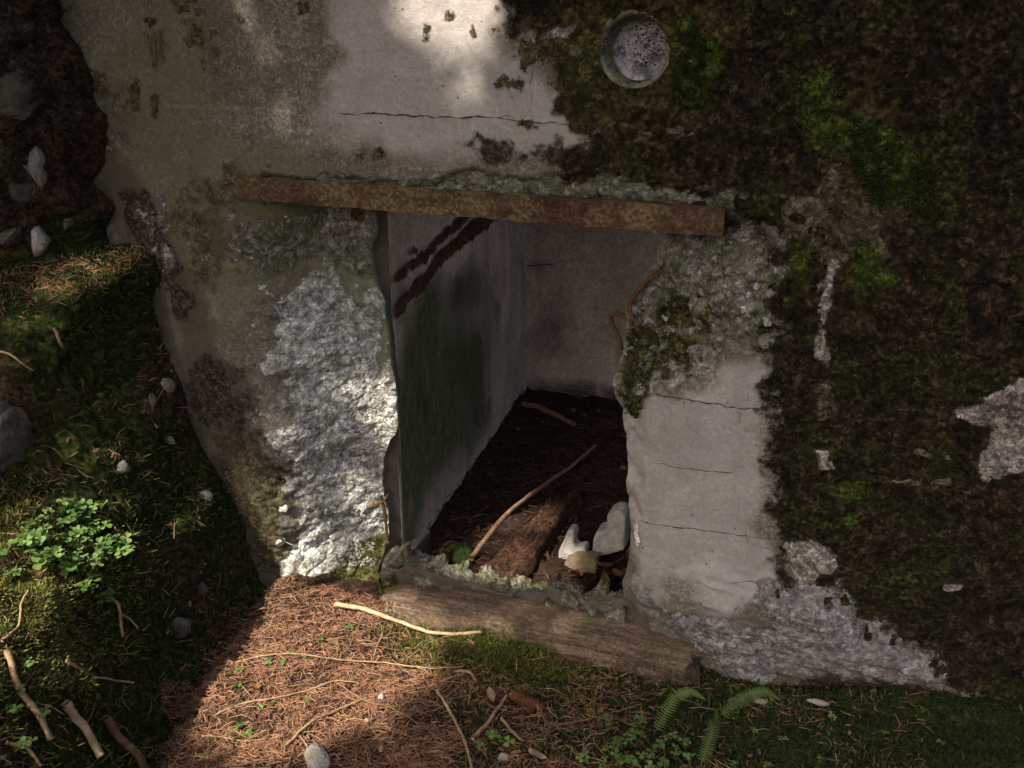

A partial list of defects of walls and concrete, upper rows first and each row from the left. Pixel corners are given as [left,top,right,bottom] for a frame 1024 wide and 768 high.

crack [340,68,590,125]
corrosion [395,217,498,320]
spalling [269,170,791,401]
spalling [220,206,398,577]
crack [653,393,761,421]
peeling [954,377,1024,482]
crack [656,463,734,473]
crack [641,520,774,552]
peeling [783,539,838,585]
peeling [943,584,964,592]
spalling [623,568,816,685]